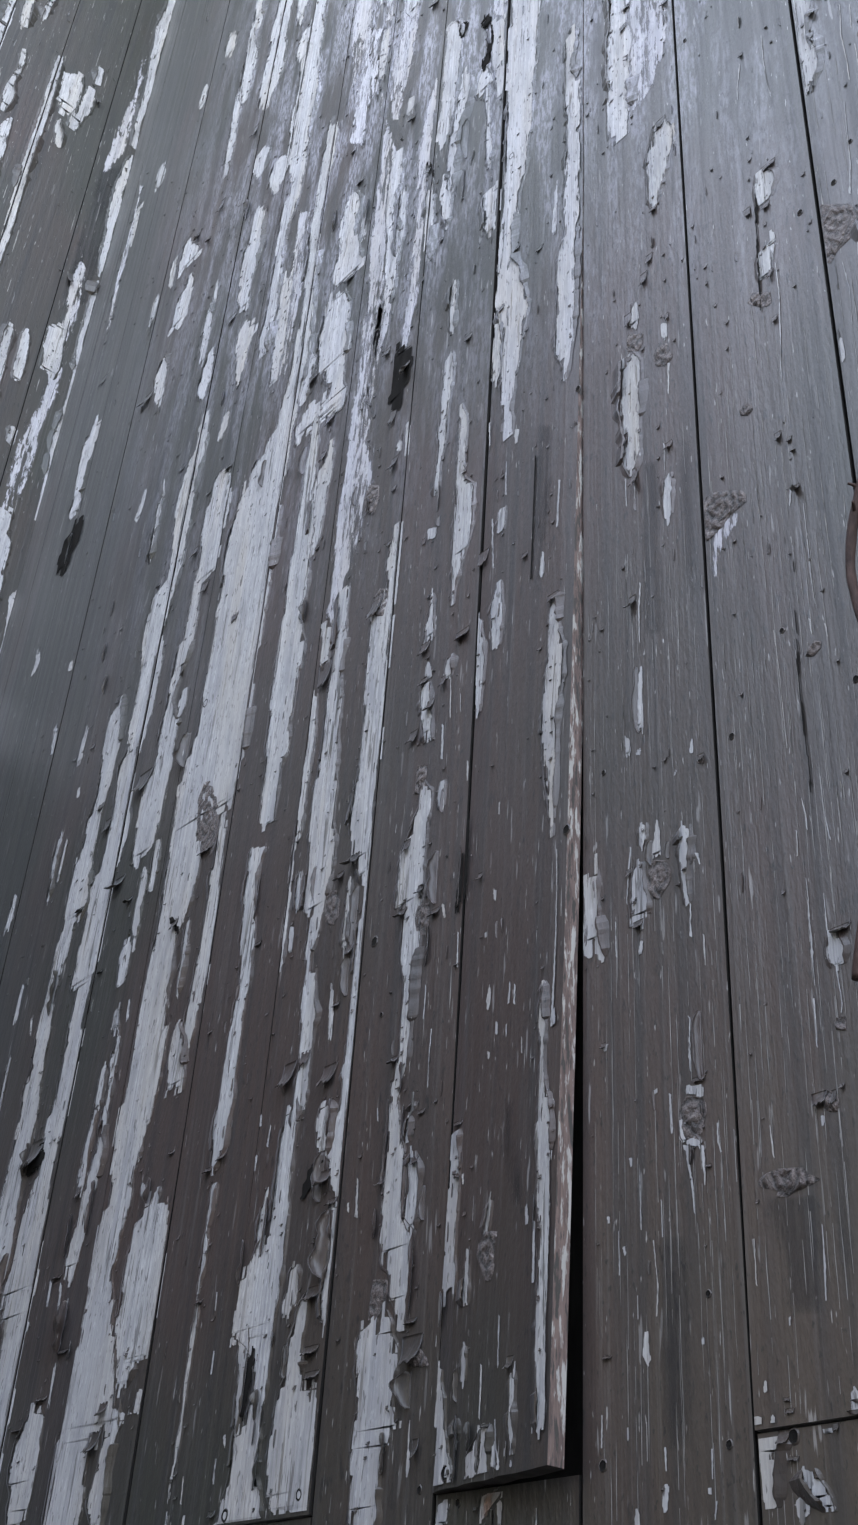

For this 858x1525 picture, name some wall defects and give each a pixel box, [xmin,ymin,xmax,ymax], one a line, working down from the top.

peeling [836,328,845,362]
peeling [627,810,697,954]
peeling [754,1381,838,1525]